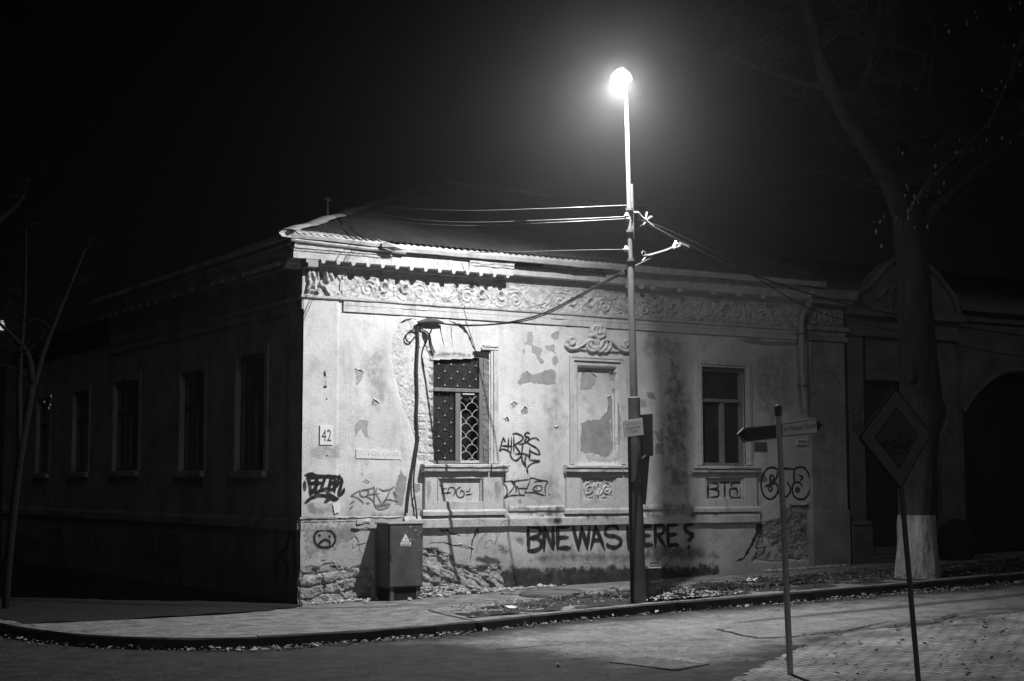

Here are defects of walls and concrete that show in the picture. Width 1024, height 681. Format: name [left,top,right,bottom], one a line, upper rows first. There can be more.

peeling [517,329,560,385]
peeling [355,419,369,437]
spalling [391,320,490,464]
peeling [580,368,621,462]
spalling [752,503,809,562]
spalling [297,564,375,605]
spalling [422,543,504,593]